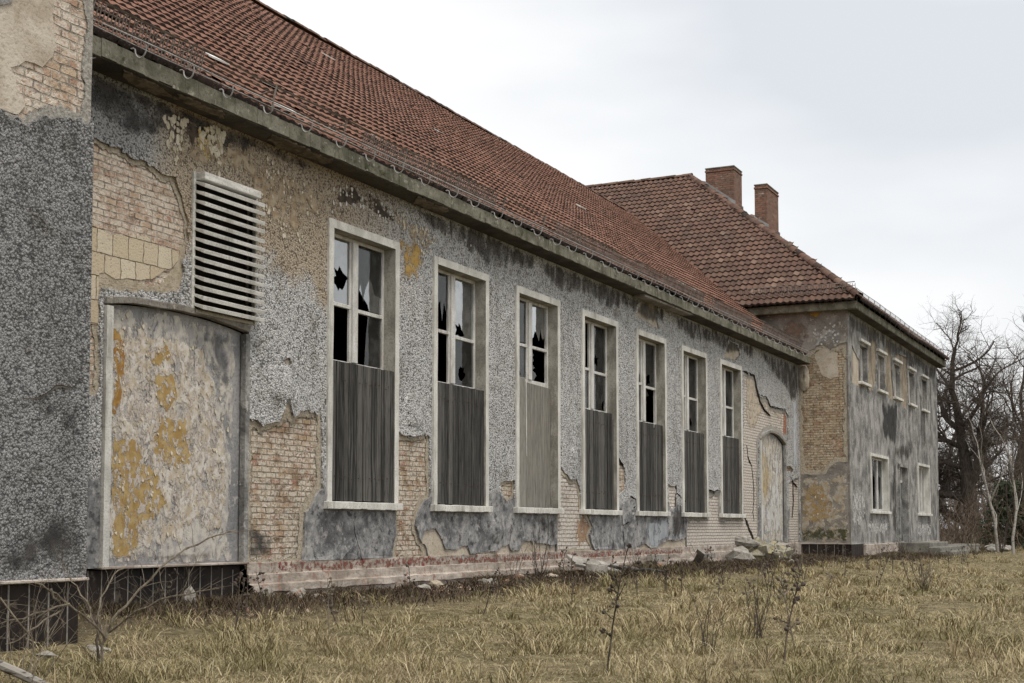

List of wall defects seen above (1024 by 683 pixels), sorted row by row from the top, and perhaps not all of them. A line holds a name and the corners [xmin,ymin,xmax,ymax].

flaking render [0,0,93,128]
flaking render [89,70,333,395]
peeling [109,309,235,563]
flaking render [244,323,907,573]
crack [743,371,785,416]